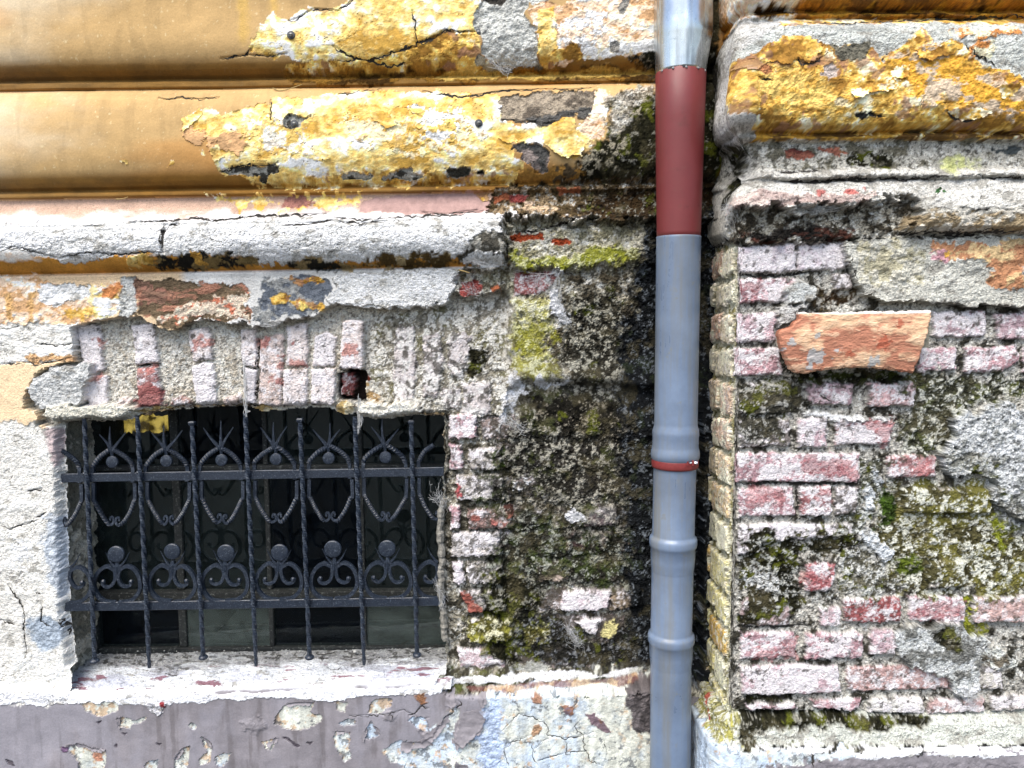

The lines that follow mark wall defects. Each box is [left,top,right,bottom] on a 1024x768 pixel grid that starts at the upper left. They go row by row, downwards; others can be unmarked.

crack [334,13,472,95]
peeling [249,0,655,78]
crack [423,87,592,98]
peeling [712,18,1024,161]
crack [1,210,481,258]
peeling [0,88,656,768]
damp [610,213,657,675]
damp [691,140,758,691]
damp [803,411,897,424]
damp [858,466,895,562]
spalling [984,477,1024,538]
crack [504,684,607,766]